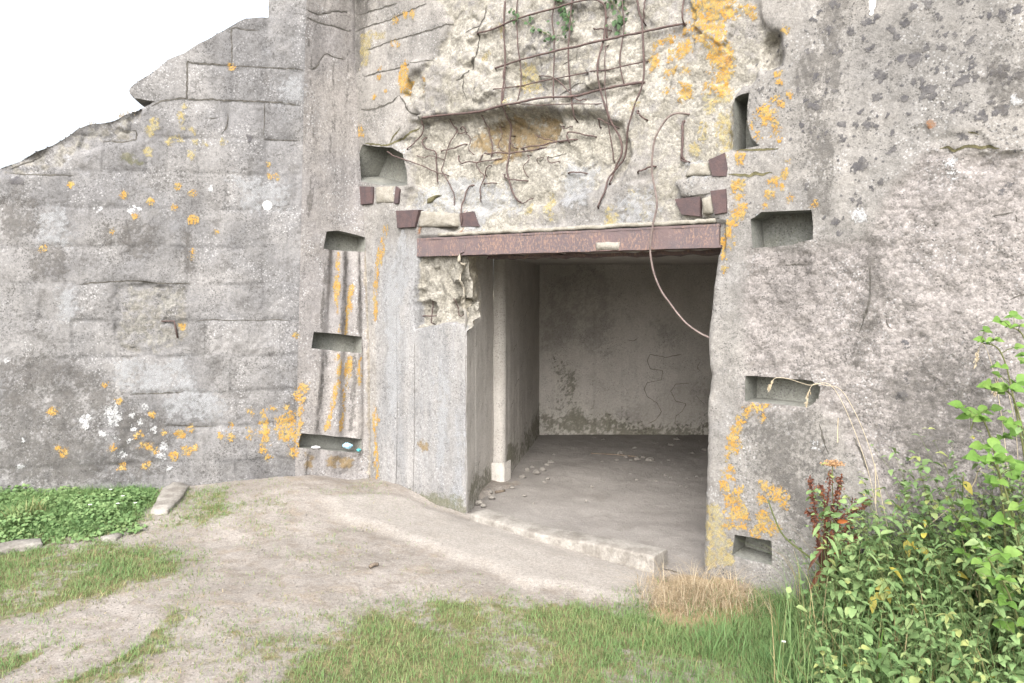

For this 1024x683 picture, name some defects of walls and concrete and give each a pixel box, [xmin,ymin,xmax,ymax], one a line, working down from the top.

spalling [387,0,793,232]
spalling [413,256,480,329]
crack [629,337,703,427]